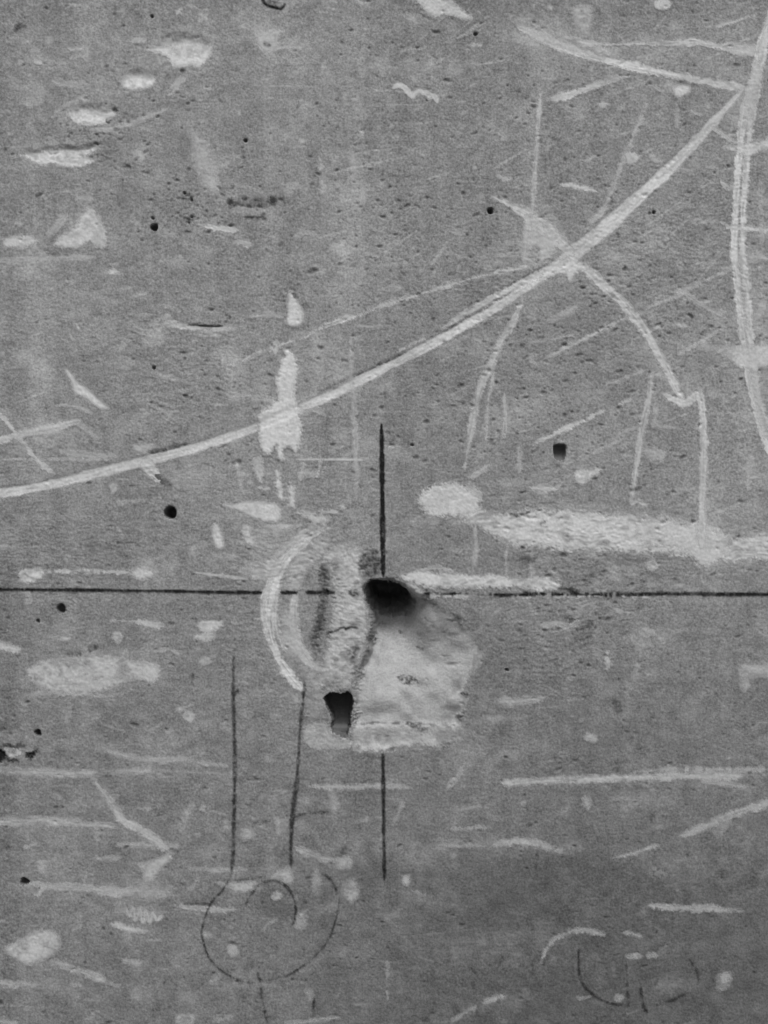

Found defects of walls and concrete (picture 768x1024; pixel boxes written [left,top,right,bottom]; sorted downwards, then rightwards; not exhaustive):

peeling [287,690,326,718]